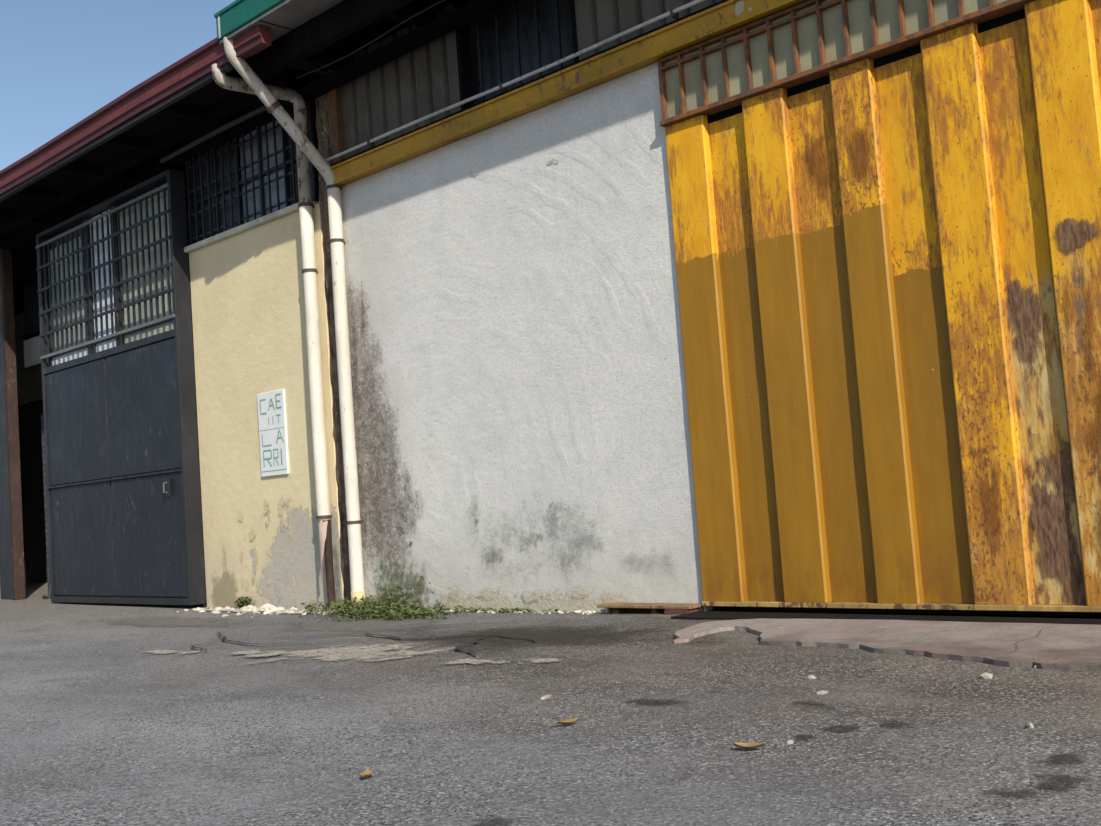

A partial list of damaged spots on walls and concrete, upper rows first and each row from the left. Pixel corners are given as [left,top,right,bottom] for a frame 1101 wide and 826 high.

peeling [238,496,343,610]
damp [347,289,418,566]
rust [1007,279,1044,404]
rust [1027,398,1086,605]